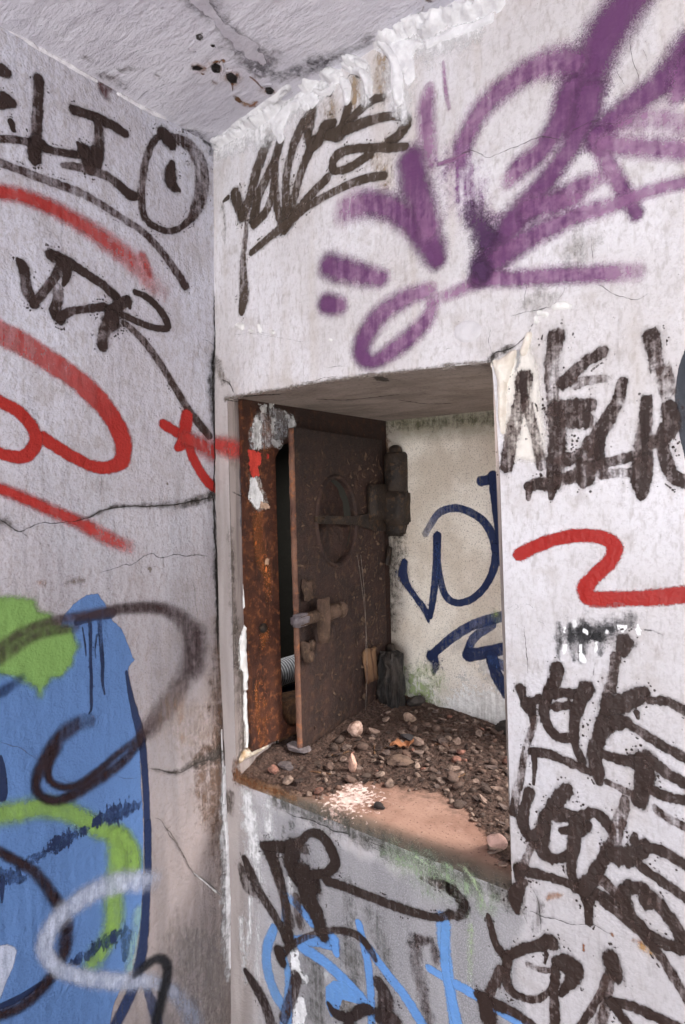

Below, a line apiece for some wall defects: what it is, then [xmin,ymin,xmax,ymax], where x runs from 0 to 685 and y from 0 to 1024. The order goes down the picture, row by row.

peeling [214,358,485,450]
crack [0,297,262,647]
peeling [248,476,270,510]
crack [157,818,227,897]
water stain [180,628,511,1024]